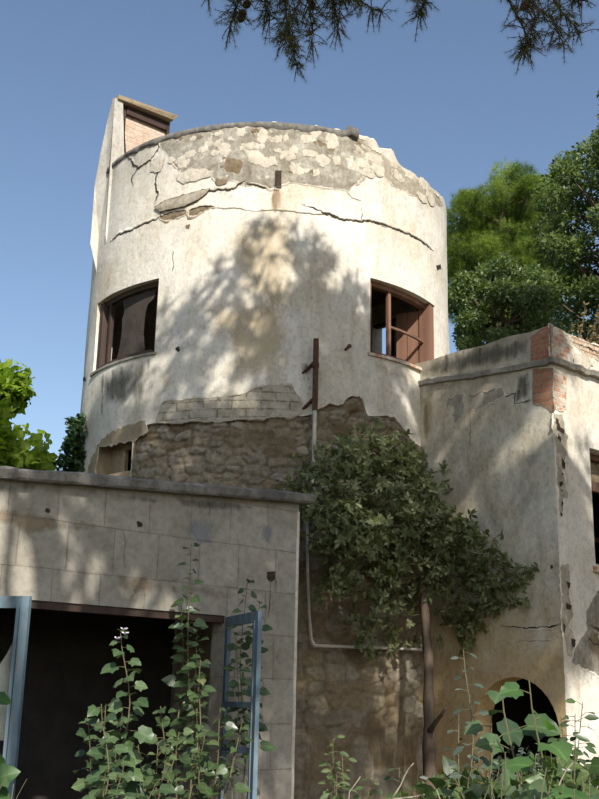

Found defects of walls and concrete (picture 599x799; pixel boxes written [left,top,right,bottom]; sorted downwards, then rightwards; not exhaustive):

crack [109,145,162,242]
flaking render [150,121,443,207]
crack [207,173,434,250]
water stain [102,371,141,400]
flaking render [88,383,303,473]
flaking render [445,387,506,424]
water stain [431,341,522,372]
crack [500,623,563,642]
flaking render [550,563,599,680]